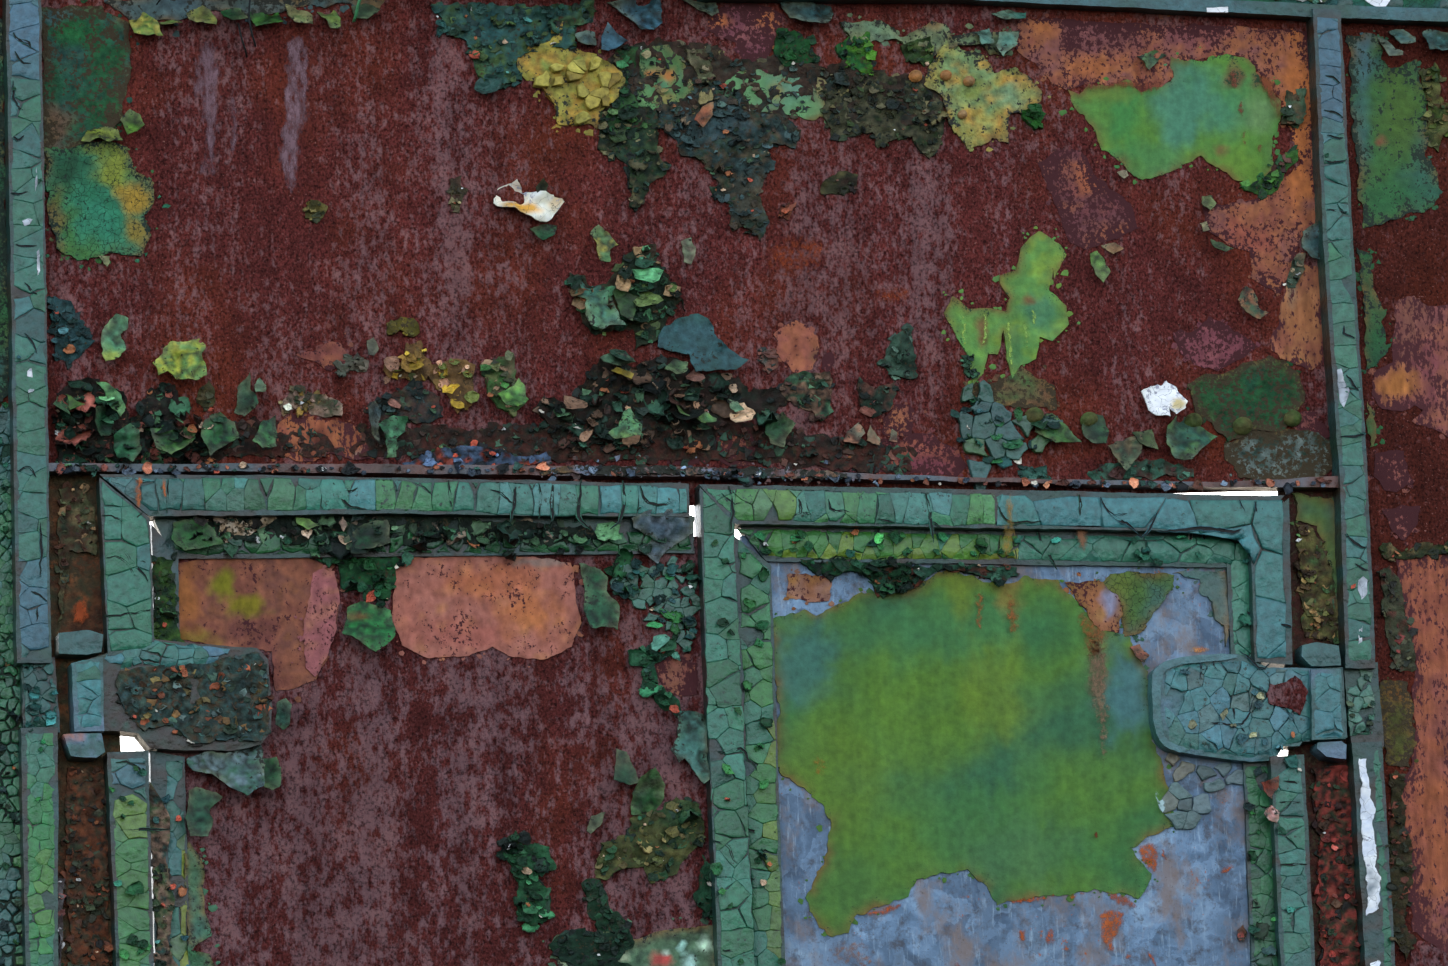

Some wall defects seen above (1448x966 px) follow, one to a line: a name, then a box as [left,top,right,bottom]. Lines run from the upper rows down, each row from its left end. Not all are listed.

crack [0,0,58,966]
peeling [0,0,384,588]
crack [533,56,622,126]
peeling [47,221,1340,652]
crack [76,380,1376,966]
peeling [430,0,1307,241]
peeling [773,555,1229,937]
crack [1317,17,1372,661]
peeling [1309,541,1448,966]
crack [1373,750,1392,966]
peeling [1345,29,1448,228]
rust [1410,940,1448,966]